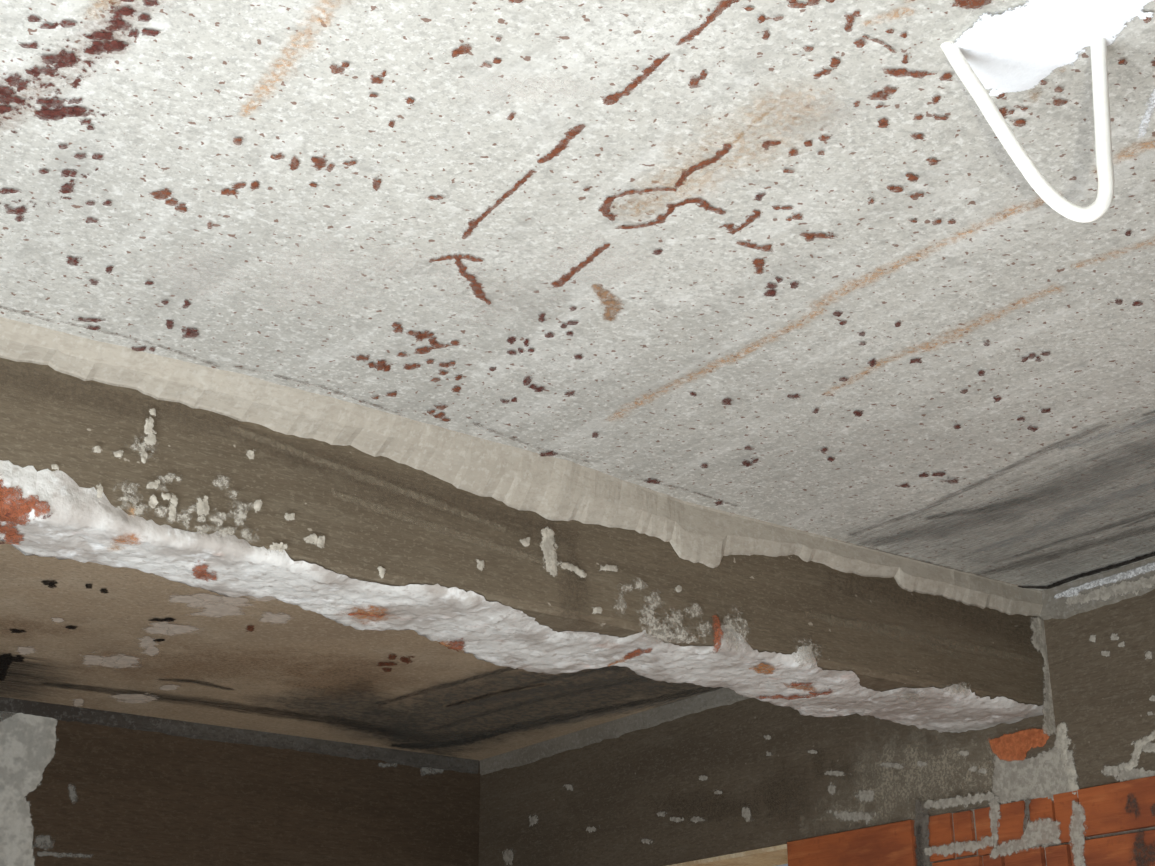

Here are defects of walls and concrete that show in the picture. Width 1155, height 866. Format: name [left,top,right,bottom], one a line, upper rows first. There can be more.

corrosion [742,0,835,40]
peeling [953,0,1154,96]
corrosion [39,145,104,194]
corrosion [270,153,357,188]
corrosion [0,188,26,222]
corrosion [150,188,187,213]
corrosion [0,479,51,545]
crack [1017,552,1155,589]
damp [808,613,1056,736]
damp [0,659,721,752]
peeling [0,711,57,866]
peeling [1101,762,1155,782]